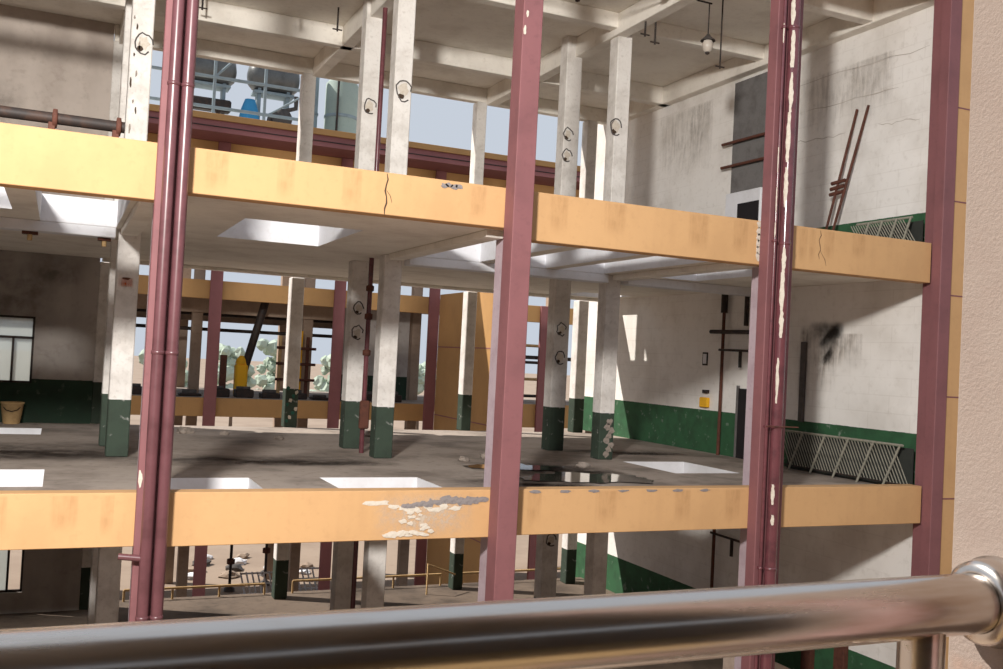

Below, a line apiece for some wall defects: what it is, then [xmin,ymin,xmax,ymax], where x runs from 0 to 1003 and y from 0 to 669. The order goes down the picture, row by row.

peeling [776,0,796,210]
crack [384,173,392,215]
peeling [363,495,489,538]